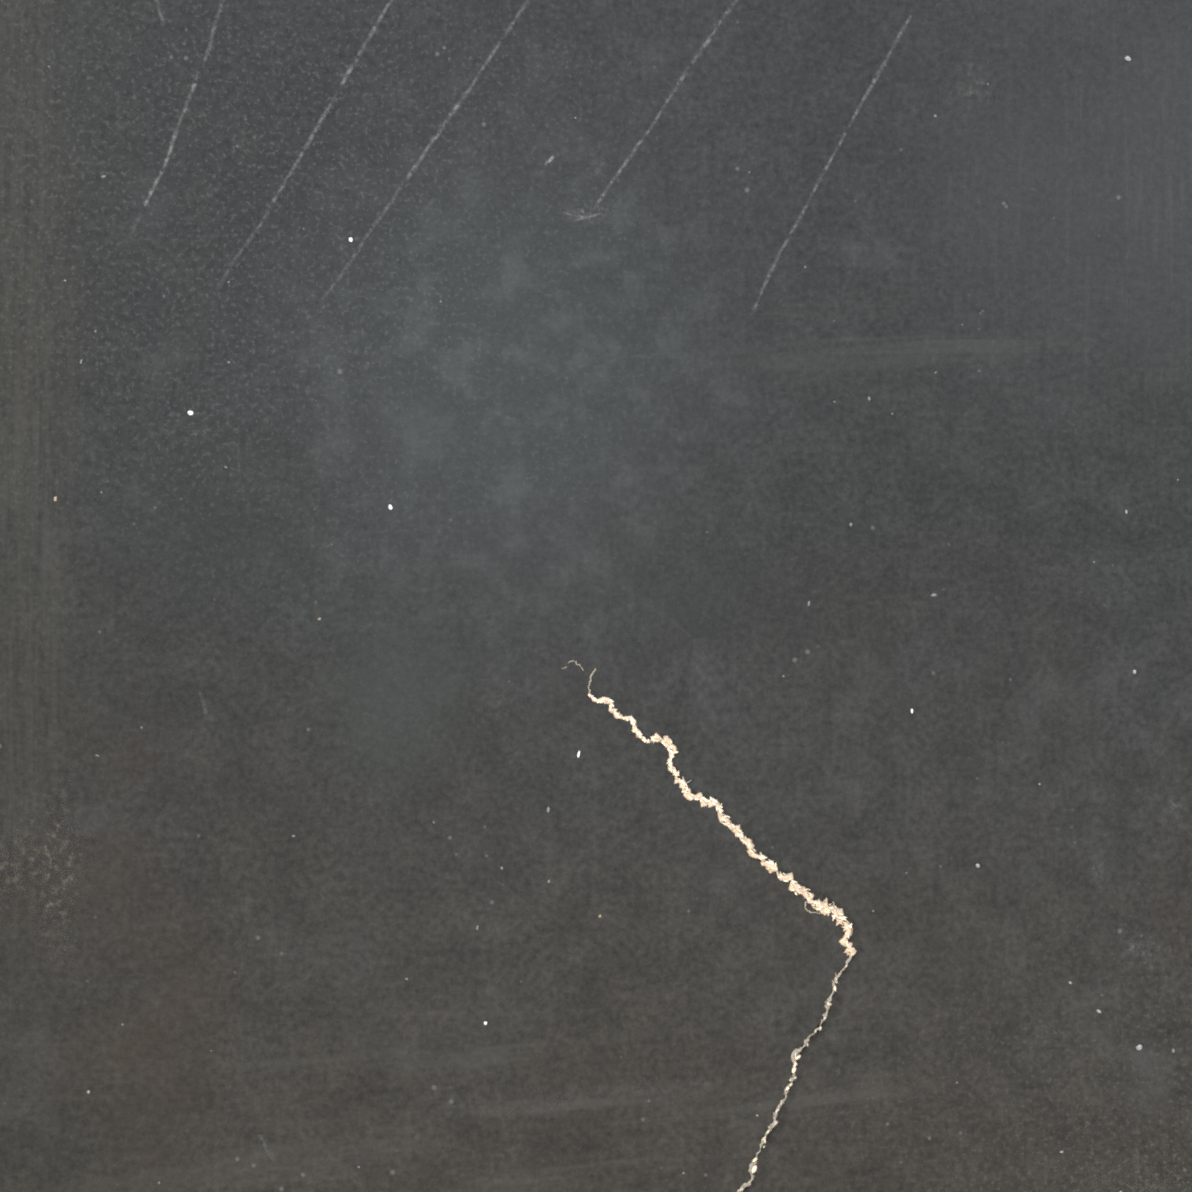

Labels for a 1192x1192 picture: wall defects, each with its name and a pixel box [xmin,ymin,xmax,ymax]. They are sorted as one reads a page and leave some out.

crack [562,660,857,1192]